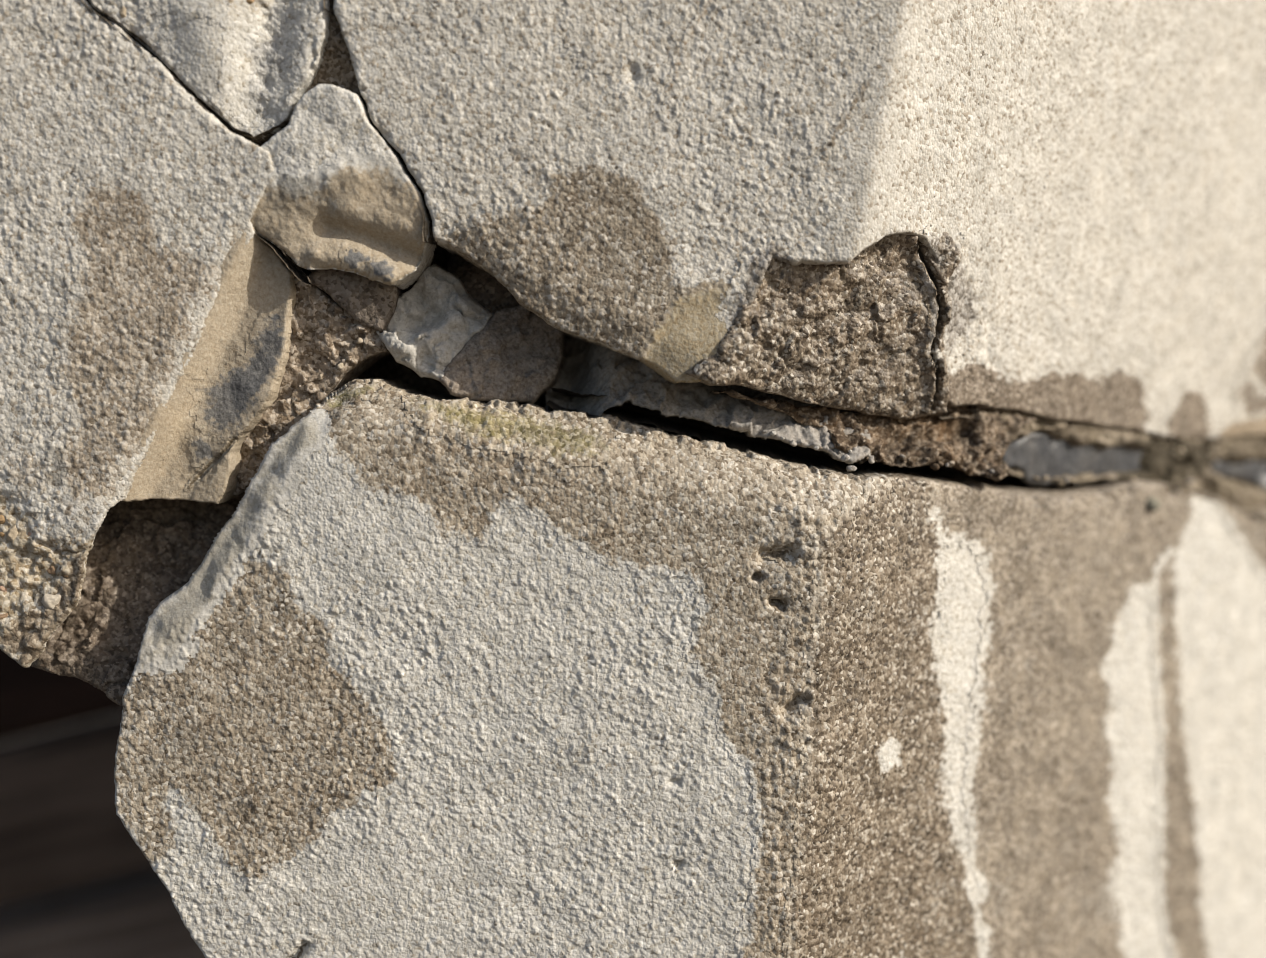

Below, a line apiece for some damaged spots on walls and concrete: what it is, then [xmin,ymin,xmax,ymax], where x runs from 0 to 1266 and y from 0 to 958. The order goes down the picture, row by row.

crack [82,0,289,147]
crack [304,0,438,245]
spalling [0,257,391,706]
crack [254,226,312,284]
leakage [438,155,805,384]
spalling [761,548,791,562]
spalling [769,598,786,610]
leakage [323,224,1266,958]
crack [546,388,1059,487]
spalling [684,232,961,419]
crack [912,237,1171,442]
leakage [114,550,406,885]